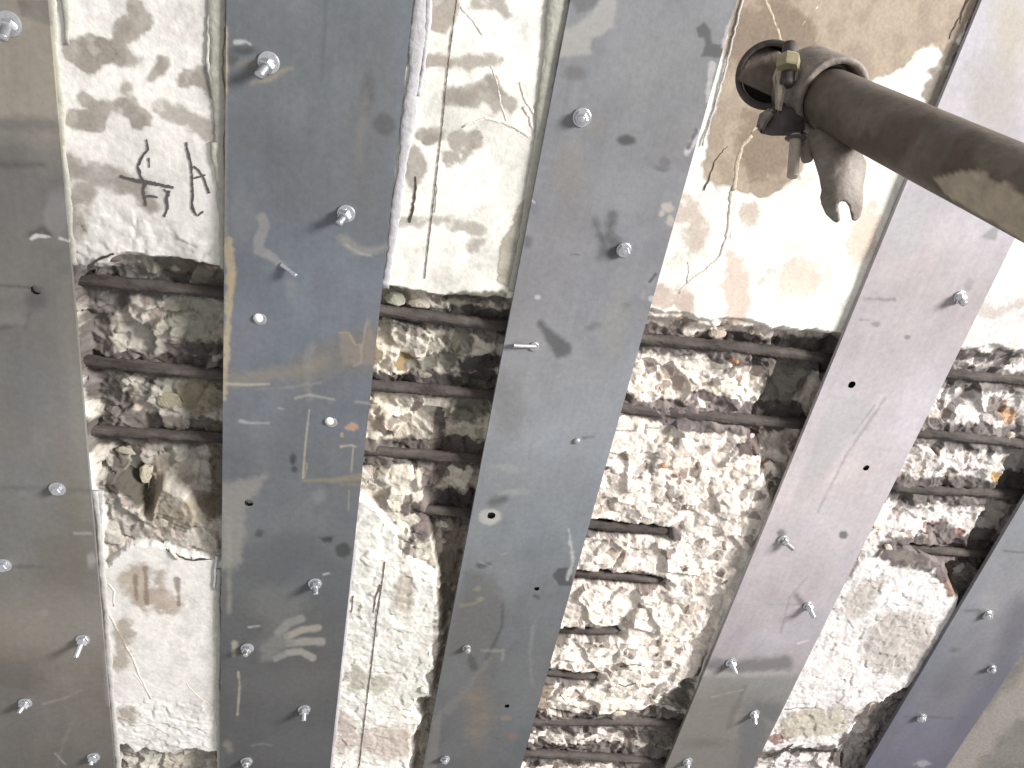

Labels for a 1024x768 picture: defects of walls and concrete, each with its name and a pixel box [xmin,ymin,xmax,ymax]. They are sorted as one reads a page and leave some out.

damp [63,0,152,73]
damp [65,83,215,140]
crack [408,0,457,279]
crack [704,146,728,191]
damp [703,0,977,225]
spalling [76,250,224,569]
crack [351,562,385,768]
spalling [359,284,513,768]
damp [434,505,470,642]
spalling [528,307,842,750]
spalling [754,674,917,768]
spalling [839,341,1024,613]